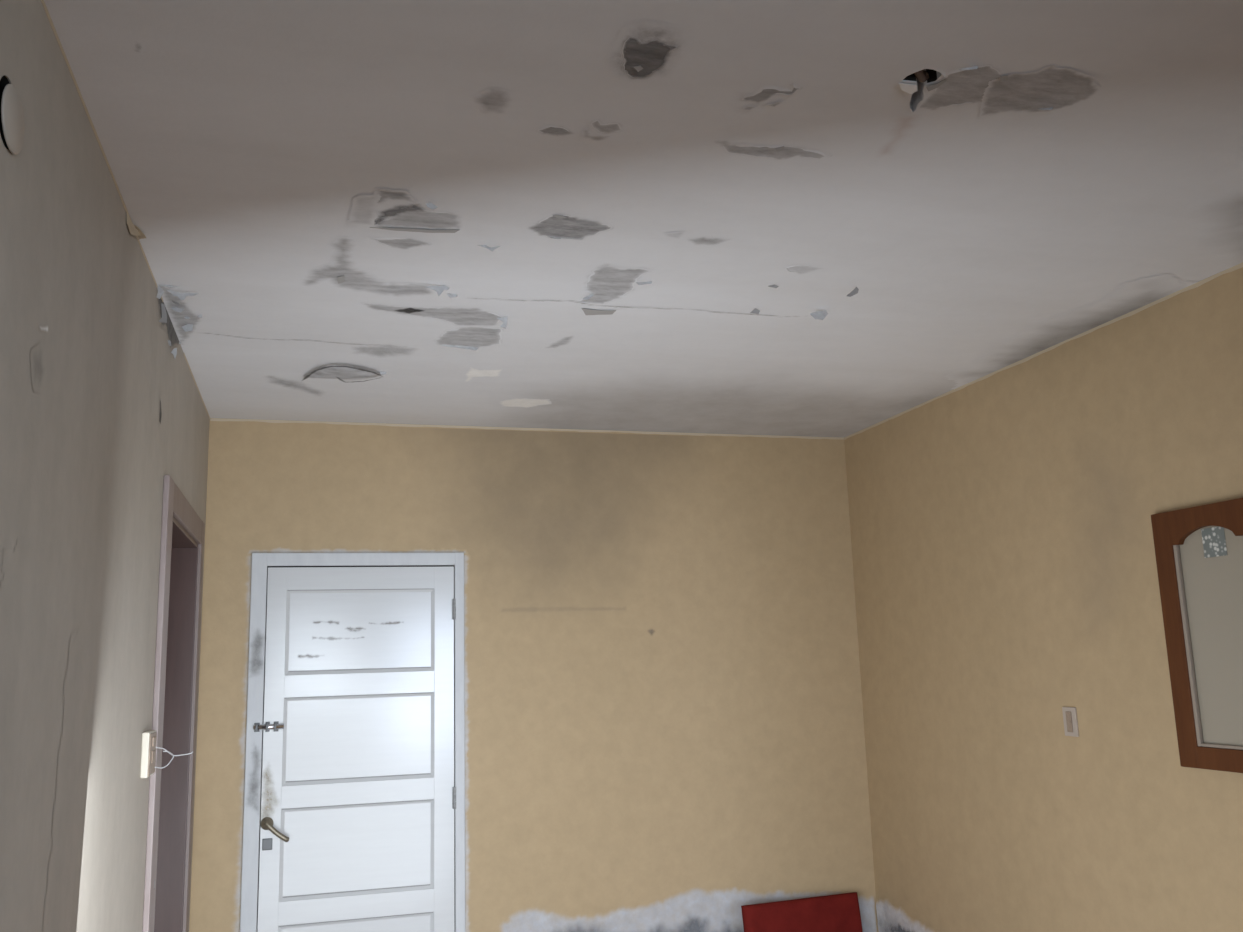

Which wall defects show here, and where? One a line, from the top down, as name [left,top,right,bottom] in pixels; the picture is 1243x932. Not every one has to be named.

peeling [604,20,689,83]
peeling [737,83,805,111]
peeling [896,63,1101,117]
peeling [534,118,626,142]
peeling [712,139,834,161]
peeling [525,213,616,241]
peeling [300,188,508,350]
peeling [576,263,655,315]
flaking render [156,283,203,358]